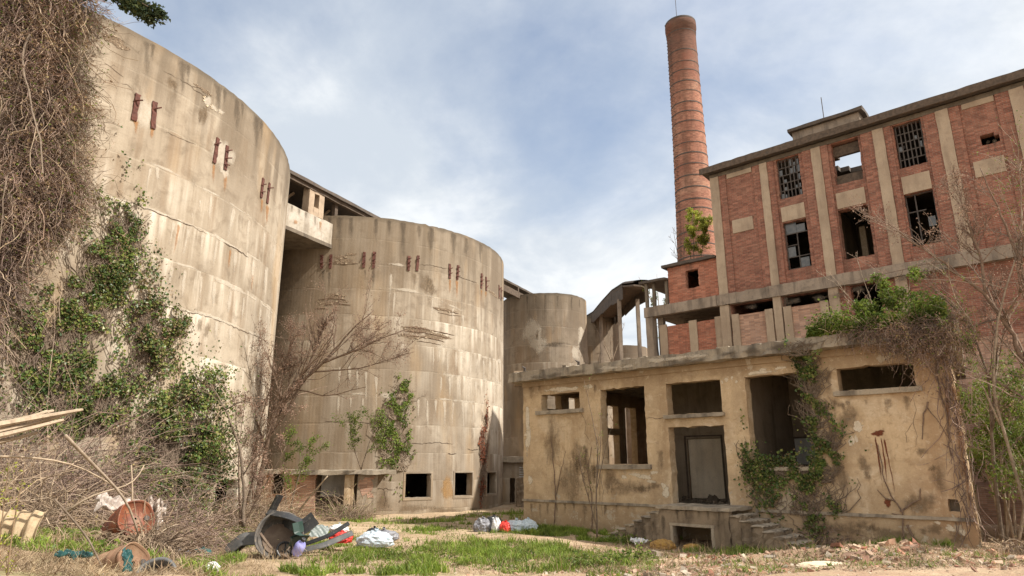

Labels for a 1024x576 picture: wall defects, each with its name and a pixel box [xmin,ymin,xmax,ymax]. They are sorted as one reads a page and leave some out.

spalling [194,83,223,113]
rust [871,430,894,485]